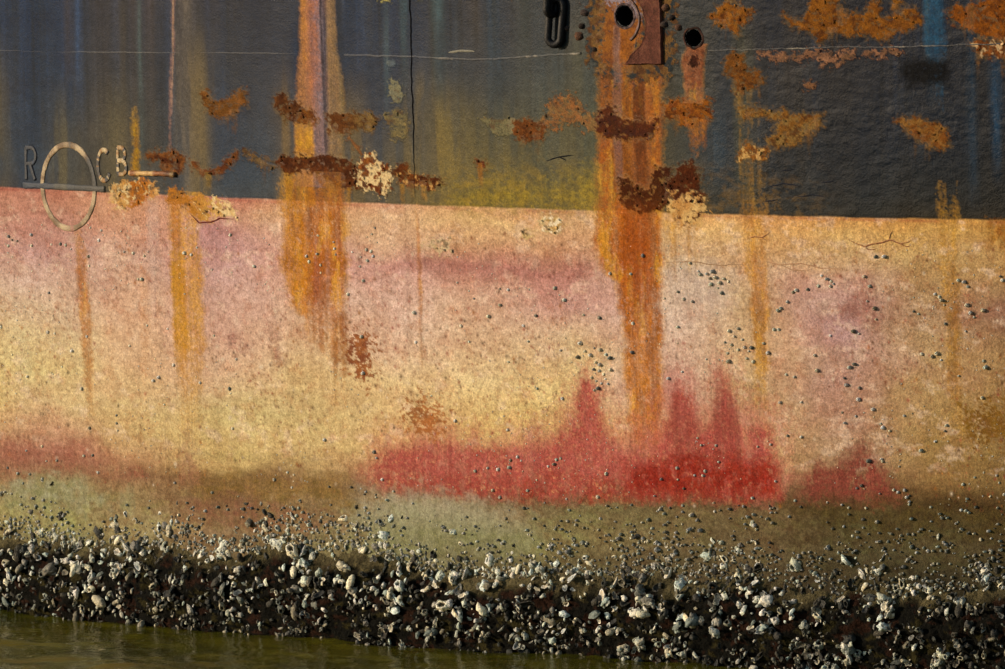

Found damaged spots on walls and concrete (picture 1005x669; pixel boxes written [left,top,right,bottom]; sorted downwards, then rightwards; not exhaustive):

corrosion [778,0,926,55]
corrosion [941,0,1005,79]
peeling [105,175,242,226]
corrosion [129,0,390,453]
peeling [349,146,397,203]
corrosion [578,0,717,422]
corrosion [705,0,828,404]
corrosion [890,111,955,161]